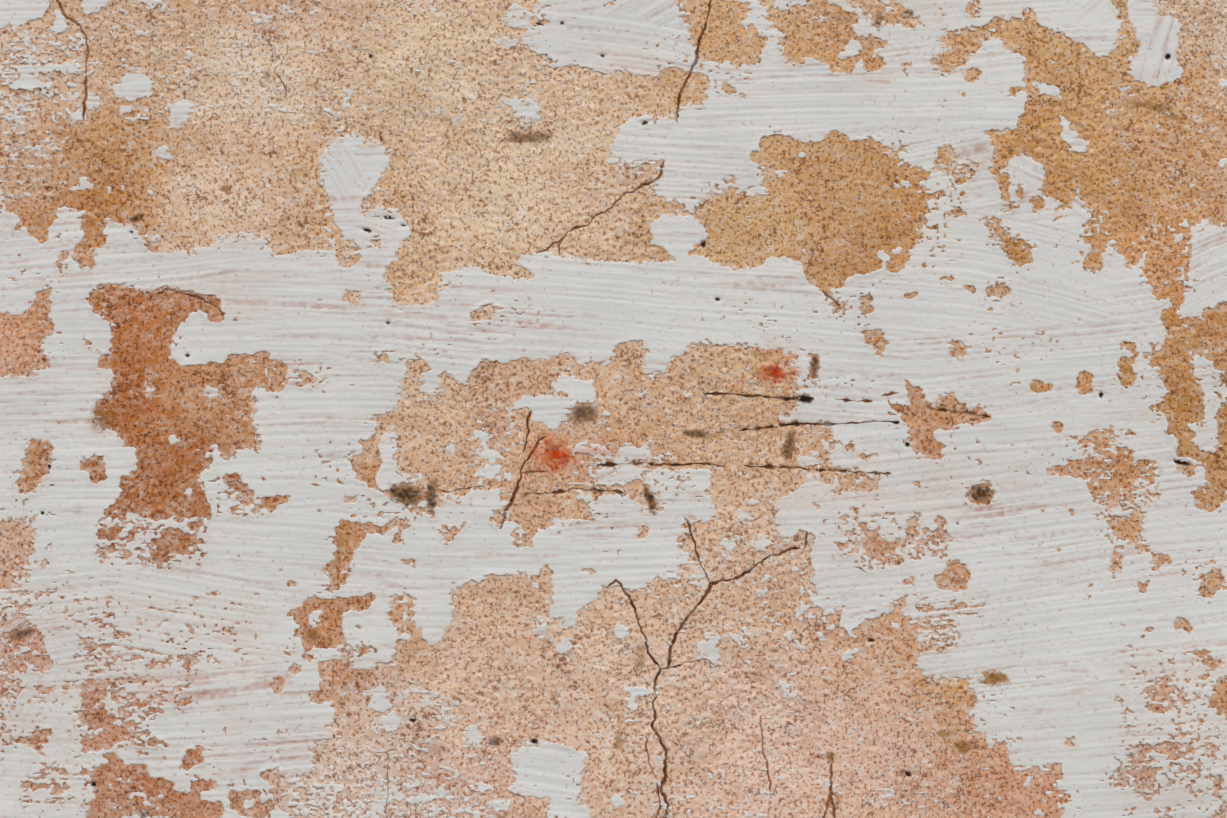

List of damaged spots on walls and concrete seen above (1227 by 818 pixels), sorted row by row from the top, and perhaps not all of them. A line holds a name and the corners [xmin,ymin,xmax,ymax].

crack [57,0,89,119]
crack [676,0,711,123]
crack [536,161,664,254]
peeling [0,0,1227,604]
crack [500,410,546,529]
peeling [0,319,1080,818]
crack [606,517,808,818]
spalling [1174,617,1193,633]